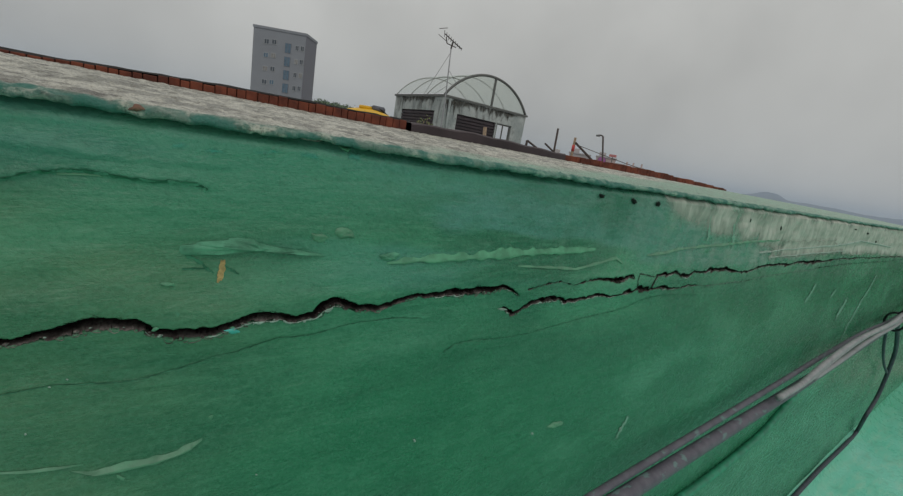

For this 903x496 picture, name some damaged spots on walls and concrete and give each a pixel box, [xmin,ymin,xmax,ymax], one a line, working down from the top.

crack [0,256,903,396]